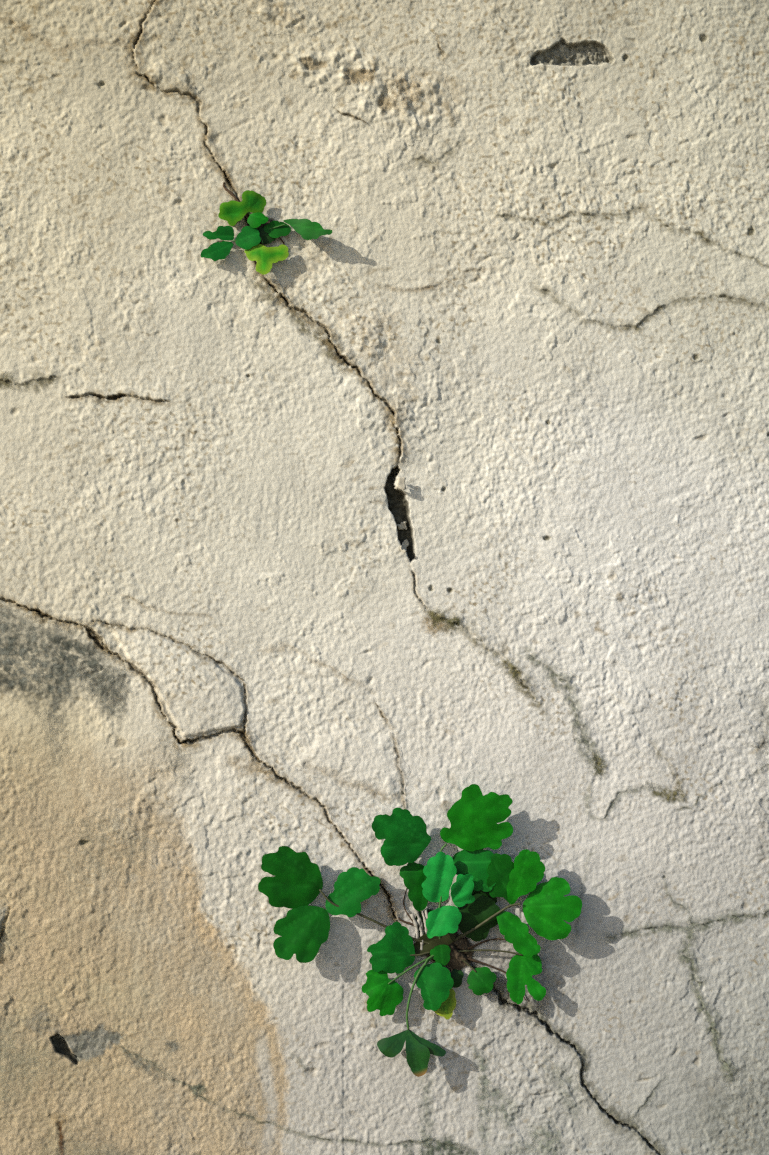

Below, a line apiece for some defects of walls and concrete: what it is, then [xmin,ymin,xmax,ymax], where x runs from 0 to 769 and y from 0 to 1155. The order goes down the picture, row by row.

crack [130,0,246,223]
spalling [530,39,628,66]
crack [0,376,125,400]
crack [257,274,402,469]
crack [622,306,663,330]
water stain [0,612,125,713]
crack [0,598,398,922]
crack [428,611,605,774]
crack [605,780,700,818]
spalling [50,1024,122,1064]
water stain [0,782,283,1155]
crack [471,964,665,1155]